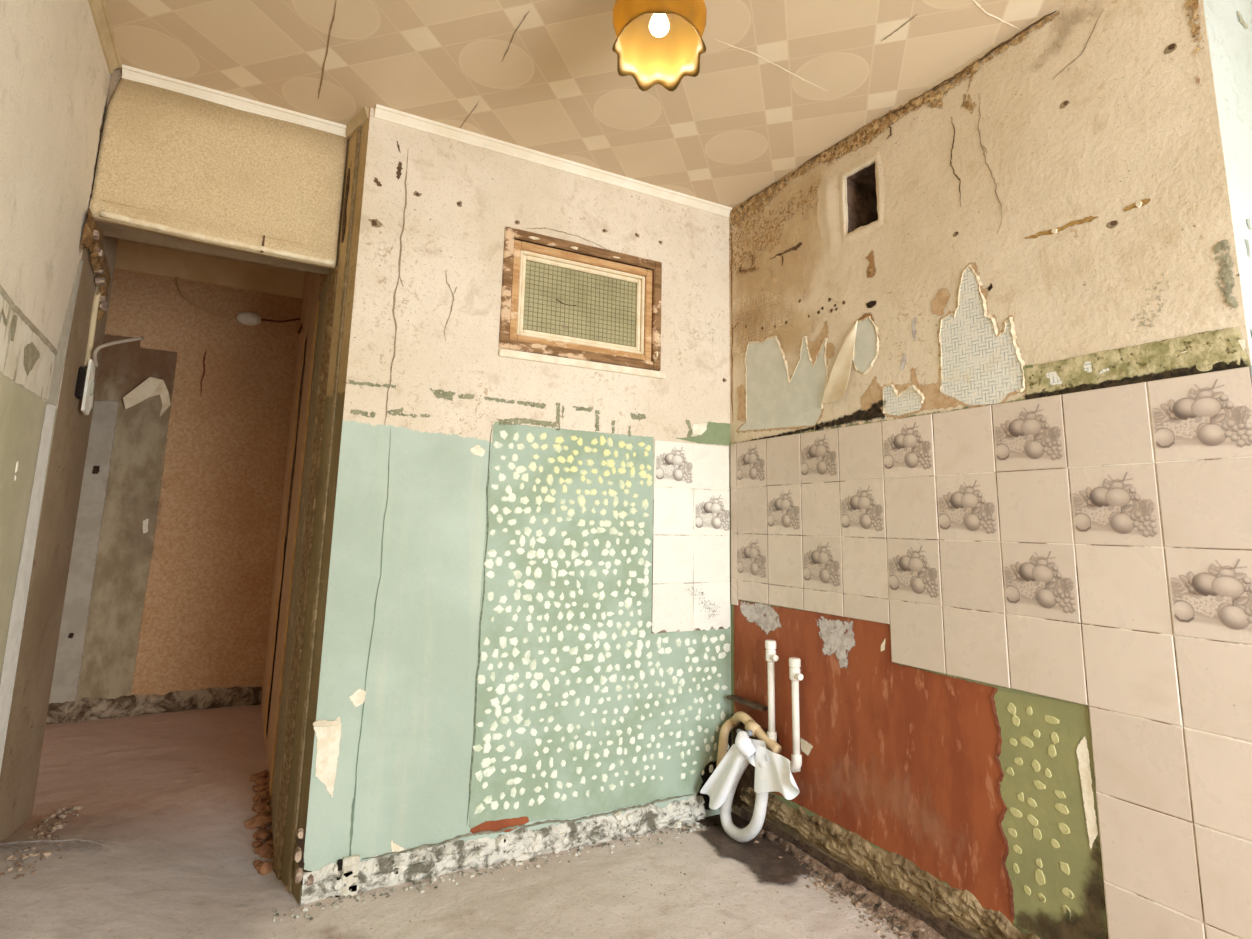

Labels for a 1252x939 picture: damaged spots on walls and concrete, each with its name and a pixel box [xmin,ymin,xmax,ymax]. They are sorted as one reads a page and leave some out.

flaking render [729,11,1060,274]
crack [950,93,1002,235]
peeling [722,298,845,433]
peeling [853,263,1027,418]
flaking render [0,208,177,773]
crack [341,141,408,856]
flaking render [740,601,782,635]
flaking render [817,616,855,668]
flaking render [294,687,1040,939]
damp [695,812,810,885]